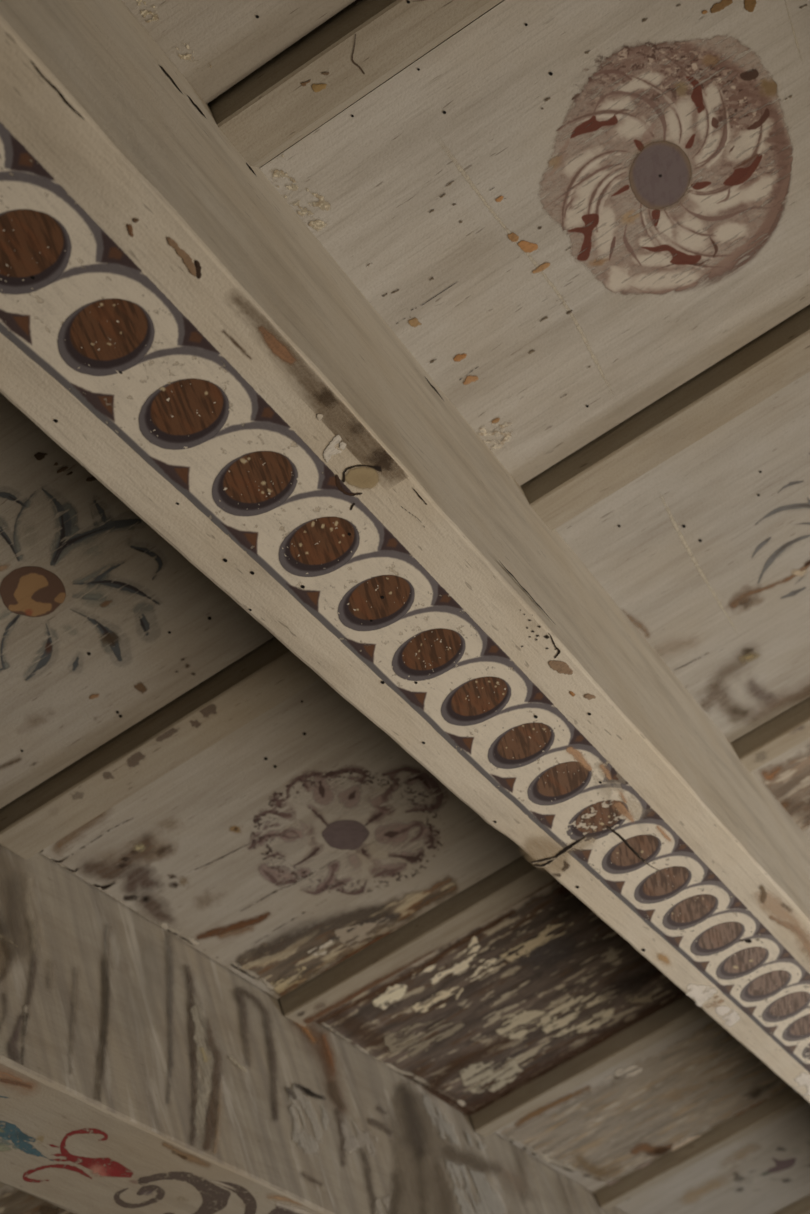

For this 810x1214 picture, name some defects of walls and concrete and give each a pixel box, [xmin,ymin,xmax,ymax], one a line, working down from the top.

peeling [762,753,810,831]
crack [532,826,660,871]
peeling [236,876,457,996]
peeling [315,882,740,1150]
peeling [290,1085,377,1155]
peeling [446,1161,506,1214]